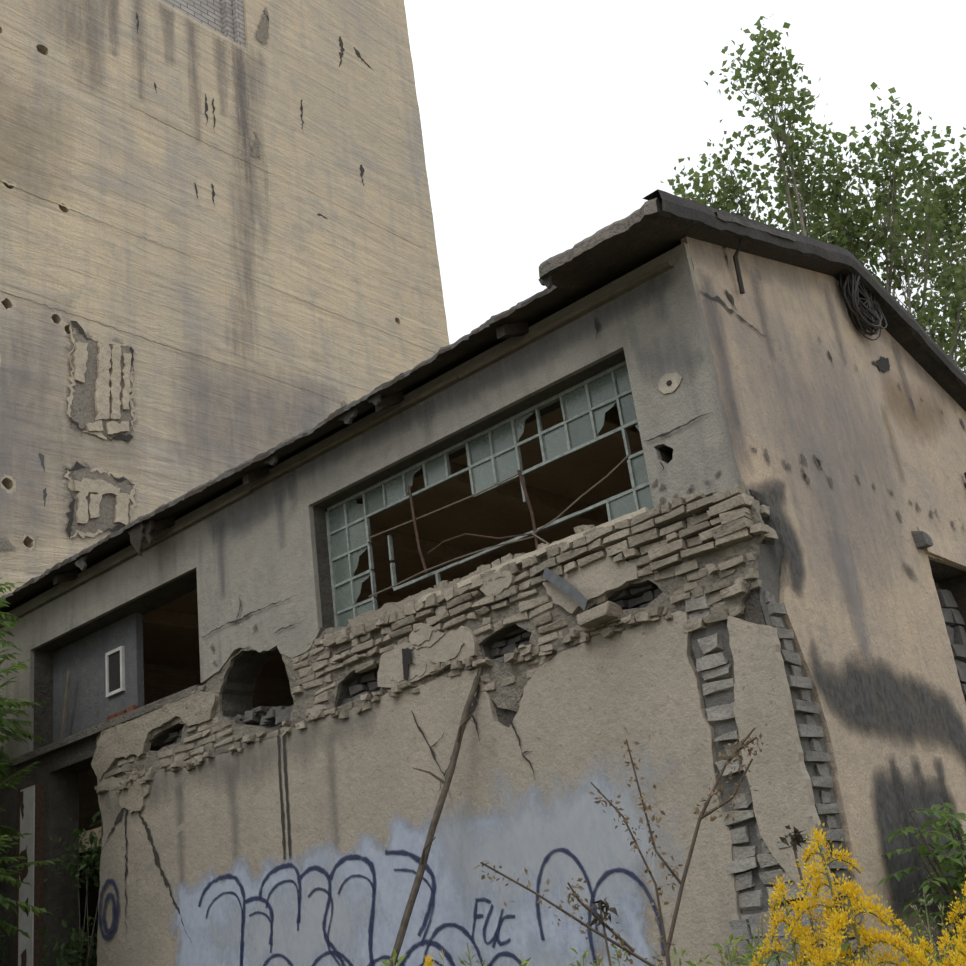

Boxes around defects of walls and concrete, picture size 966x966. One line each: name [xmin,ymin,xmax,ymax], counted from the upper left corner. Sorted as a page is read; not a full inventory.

crack [700,290,774,340]
spalling [66,321,137,442]
spalling [64,461,137,538]
spalling [783,453,833,489]
spalling [91,471,868,966]
crack [103,808,191,940]